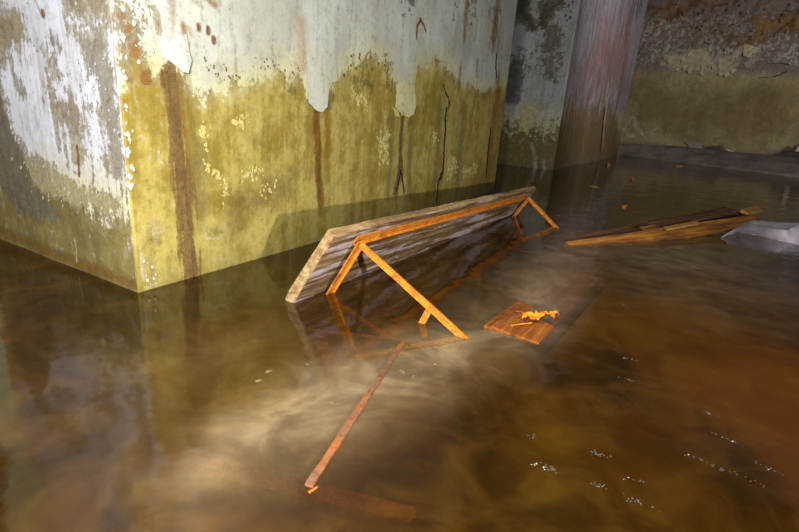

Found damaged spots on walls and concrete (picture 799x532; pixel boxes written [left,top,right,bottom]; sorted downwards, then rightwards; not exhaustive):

corrosion [141,60,202,292]
corrosion [313,109,330,208]
crack [436,85,450,203]
water stain [505,61,543,133]
water stain [557,91,786,167]